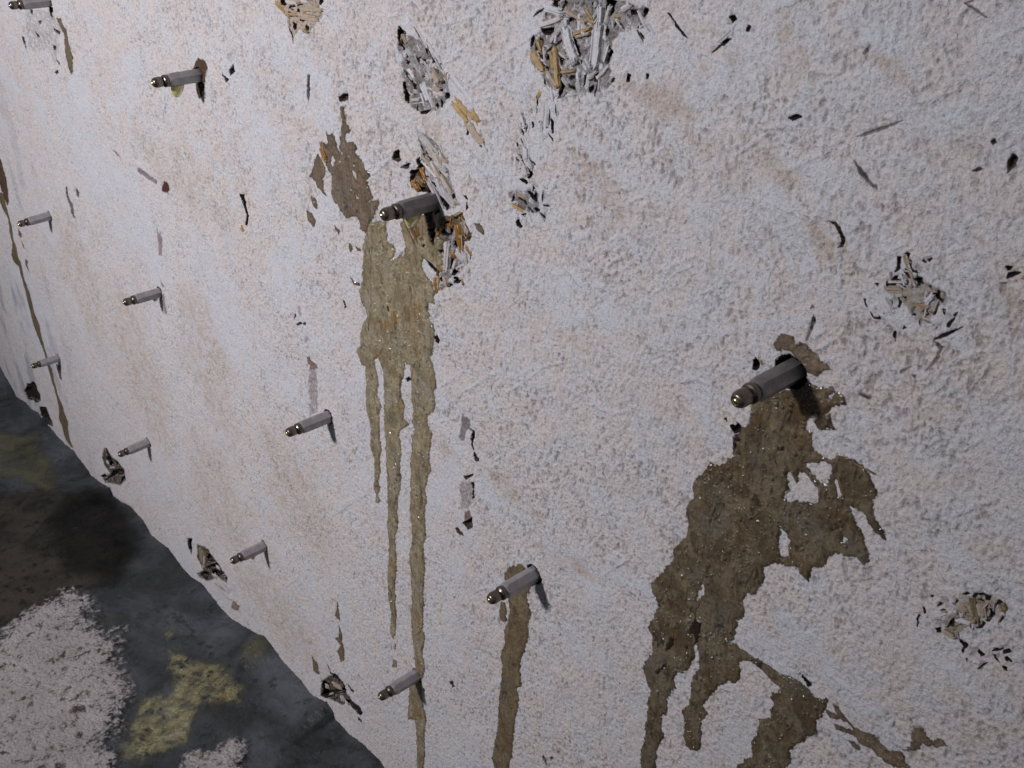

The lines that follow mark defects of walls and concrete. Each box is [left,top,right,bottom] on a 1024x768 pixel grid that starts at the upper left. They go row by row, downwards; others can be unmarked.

spalling [274,0,325,40]
spalling [397,21,474,114]
peeling [530,0,650,135]
corrosion [0,159,9,205]
spalling [410,130,472,294]
spalling [864,252,963,340]
spalling [101,448,126,486]
spalling [187,538,239,611]
spalling [916,592,1012,671]
spalling [321,666,363,722]